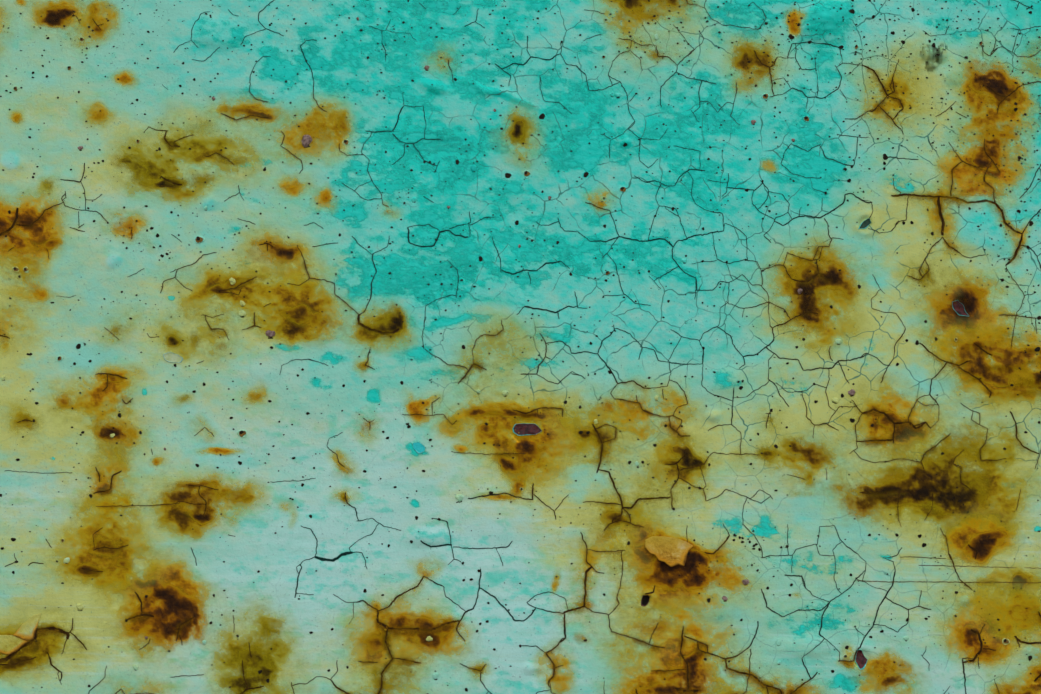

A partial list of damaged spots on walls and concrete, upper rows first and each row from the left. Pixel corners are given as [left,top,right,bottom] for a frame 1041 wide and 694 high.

crack [173,0,327,174]
crack [0,163,108,251]
rust [161,232,410,359]
crack [287,0,1041,694]
peeling [513,423,542,436]
rust [406,391,708,500]
peeling [0,613,41,655]
crack [0,618,87,685]
rust [55,366,209,656]
peeling [645,536,693,567]
rust [579,499,819,694]
rust [837,386,1041,694]